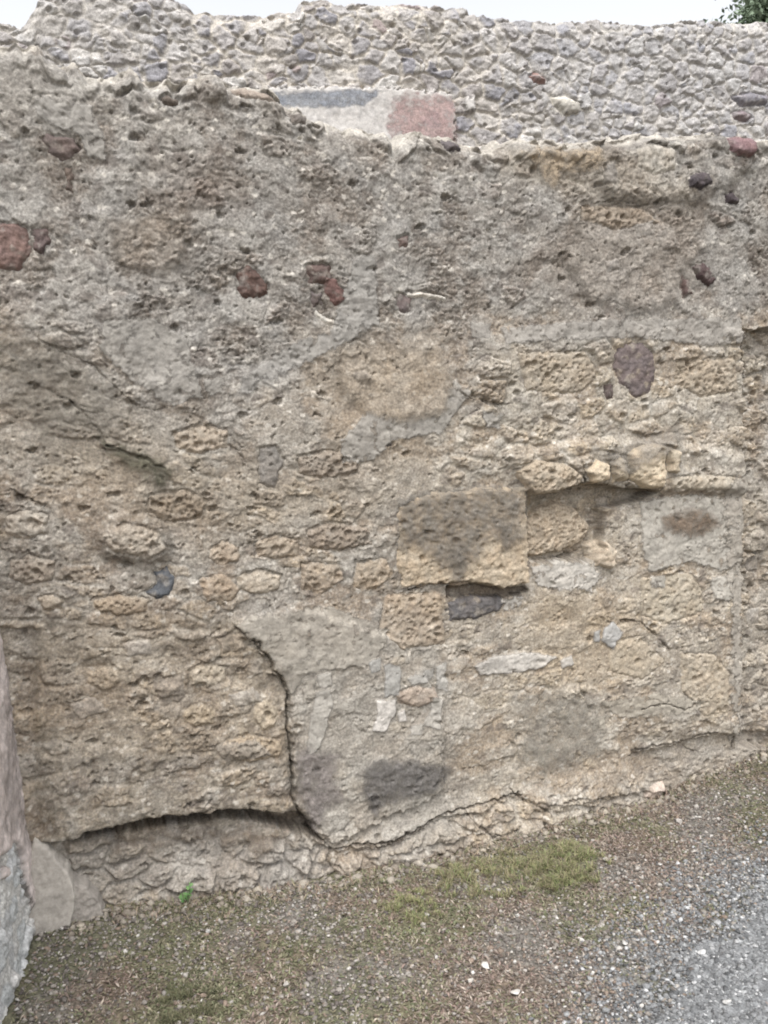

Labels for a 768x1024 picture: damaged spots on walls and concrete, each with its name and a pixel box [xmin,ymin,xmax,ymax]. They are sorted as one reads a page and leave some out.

crack [243,633,298,810]
leakage [363,761,450,815]
crack [317,789,523,873]